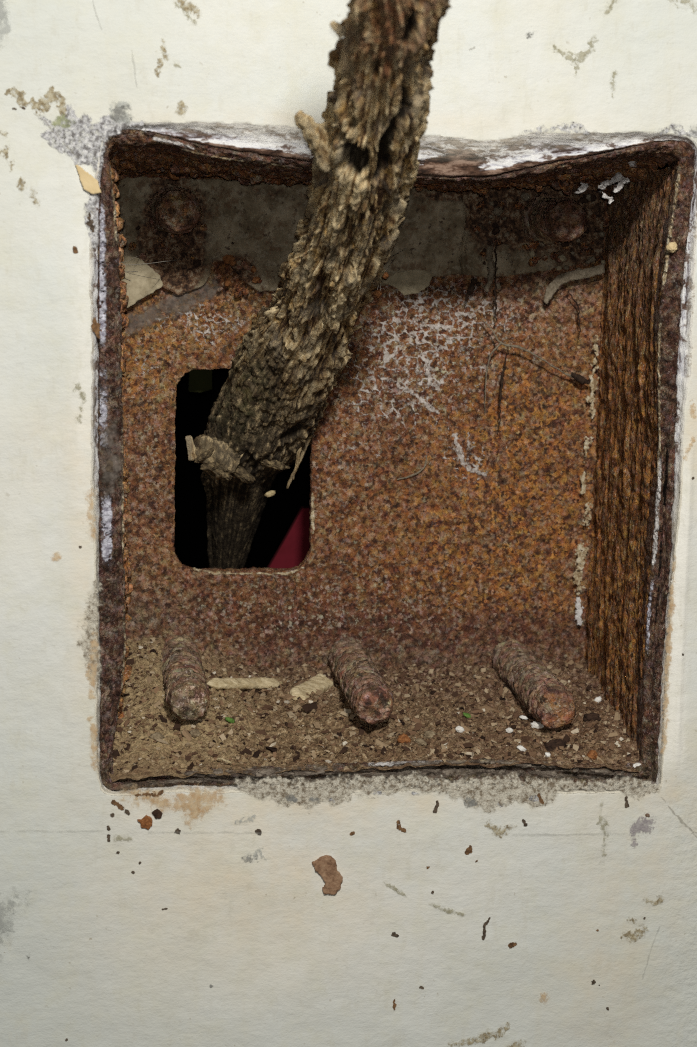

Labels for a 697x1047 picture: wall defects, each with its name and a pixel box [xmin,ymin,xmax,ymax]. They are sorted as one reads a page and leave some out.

spalling [5,86,302,346]
rust [472,192,597,267]
peeling [99,370,108,448]
peeling [100,430,124,562]